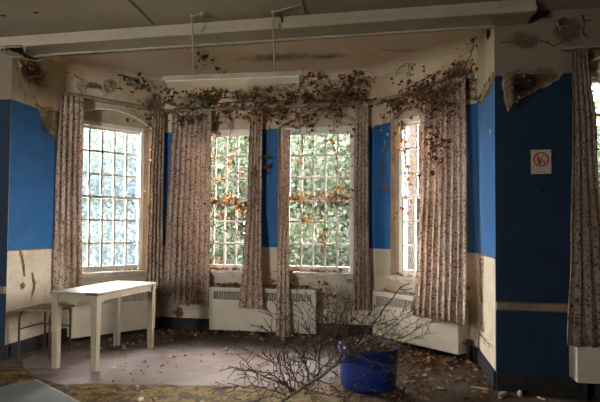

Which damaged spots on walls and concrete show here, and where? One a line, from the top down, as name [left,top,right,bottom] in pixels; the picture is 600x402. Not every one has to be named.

flaking render [0,45,46,86]
flaking render [466,69,563,111]
peeling [35,103,60,143]
peeling [19,250,37,299]